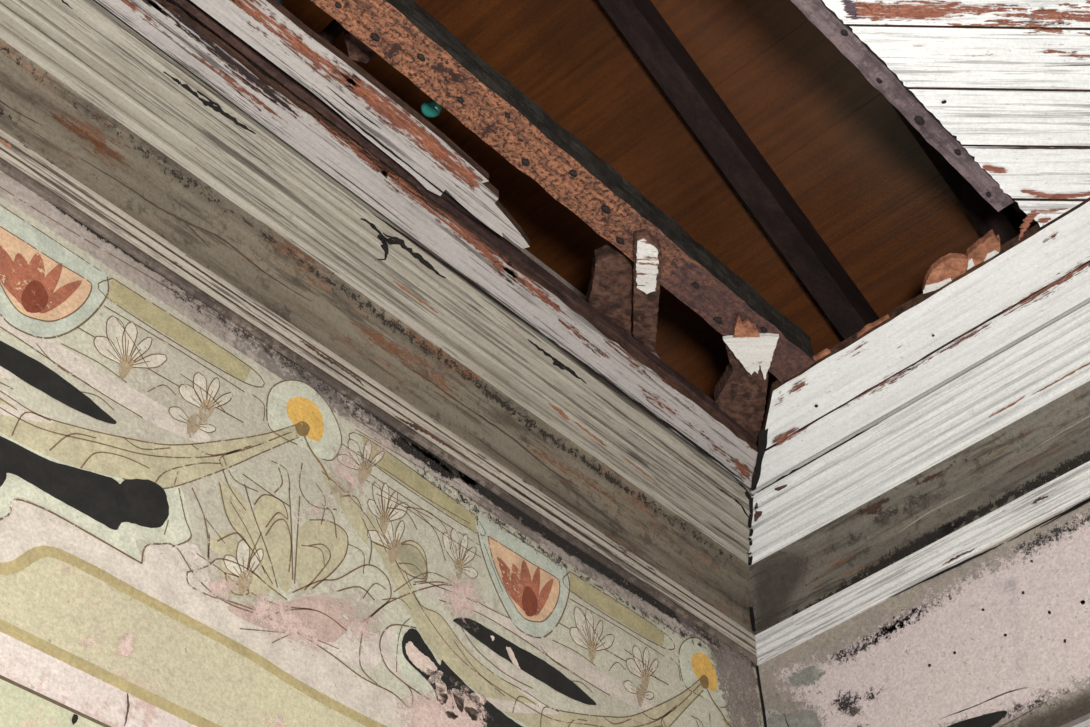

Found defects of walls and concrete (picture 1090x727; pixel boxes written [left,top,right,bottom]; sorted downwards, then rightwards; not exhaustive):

peeling [844,0,1090,33]
peeling [121,0,756,480]
peeling [1017,190,1090,243]
peeling [1002,256,1090,316]
rust [352,321,478,396]
crack [317,157,881,566]
peeling [772,427,807,447]
damp [757,449,1090,630]
damp [831,585,955,665]
peeling [397,641,487,727]
damp [828,685,884,727]
damp [983,682,1090,727]